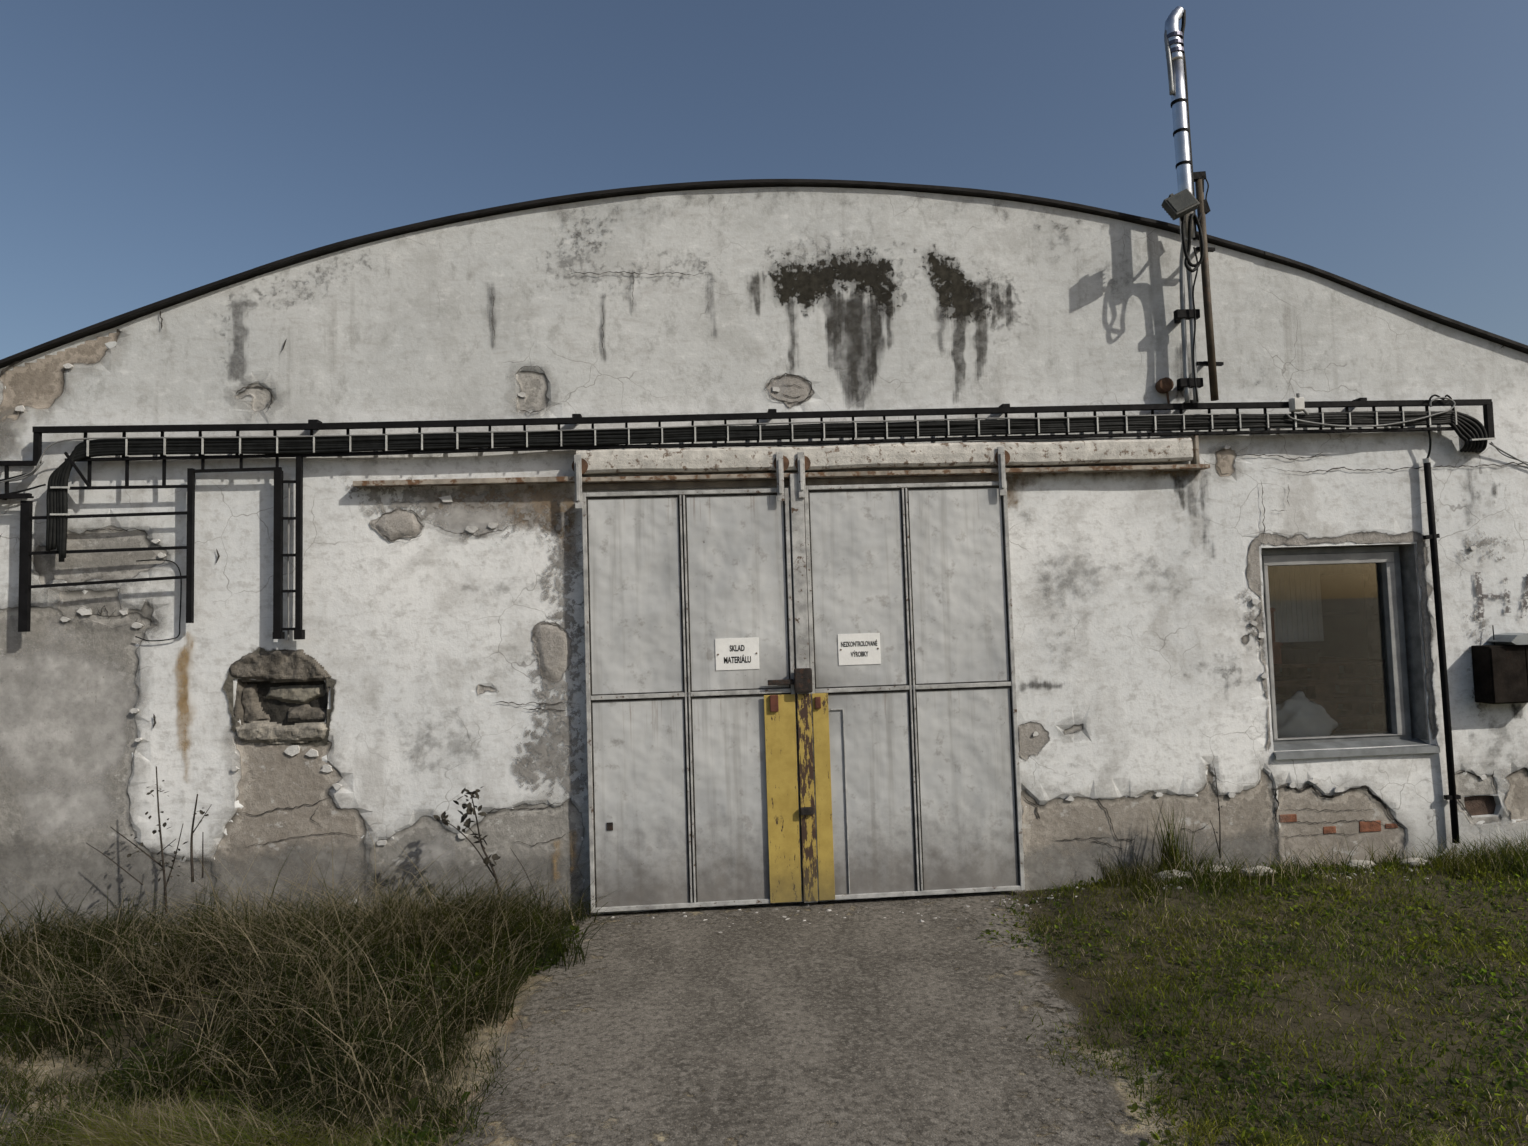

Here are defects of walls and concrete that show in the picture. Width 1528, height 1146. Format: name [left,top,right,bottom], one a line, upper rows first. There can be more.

spalling [0,329,121,441]
damp [750,248,901,401]
damp [922,244,1013,387]
corrosion [177,644,192,751]
spalling [0,479,587,942]
peeling [1018,721,1084,760]
spalling [1021,764,1406,891]
peeling [1242,531,1439,750]
spalling [1455,767,1528,825]